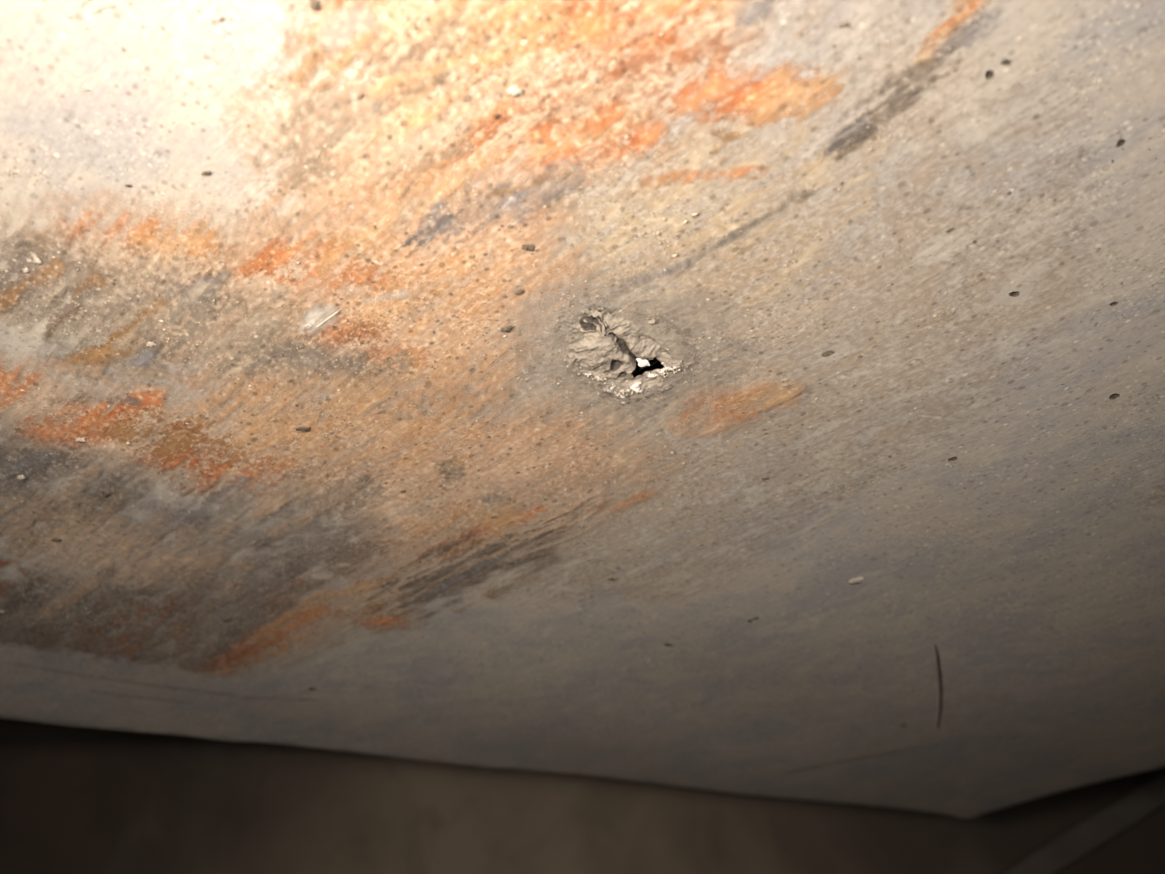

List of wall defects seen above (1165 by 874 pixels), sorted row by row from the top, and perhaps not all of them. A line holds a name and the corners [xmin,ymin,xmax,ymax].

rust [0,0,839,674]
spalling [555,302,703,405]
water stain [382,0,1004,607]